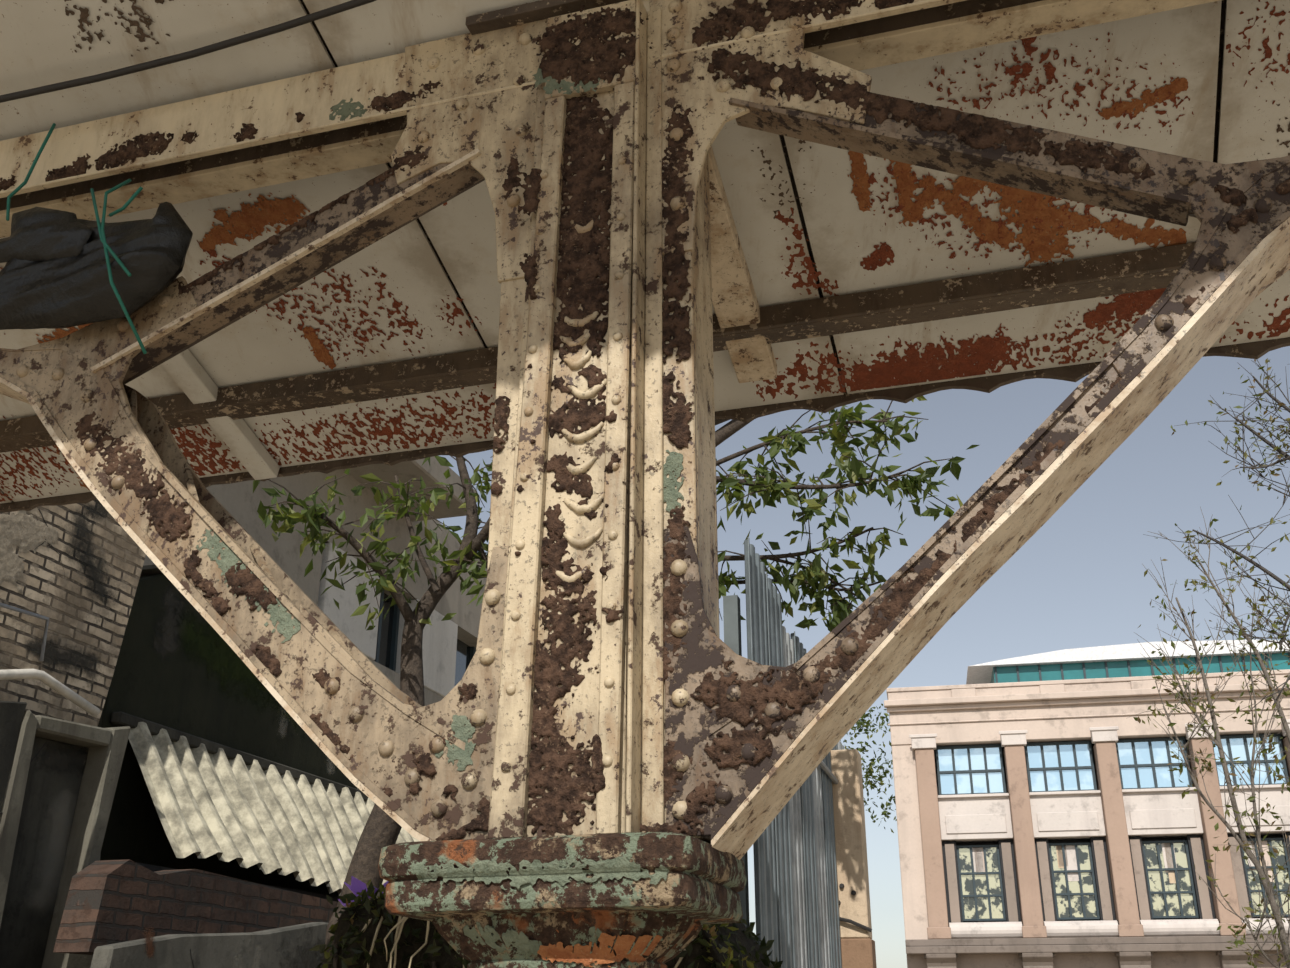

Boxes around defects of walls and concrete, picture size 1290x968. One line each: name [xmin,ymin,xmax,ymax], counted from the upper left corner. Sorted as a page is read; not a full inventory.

corrosion [692,0,1156,181]
peeling [919,32,1194,137]
peeling [1226,0,1290,107]
corrosion [173,145,428,297]
peeling [775,207,839,300]
peeling [753,288,1166,401]
peeling [848,151,1187,276]
corrosion [1085,377,1122,413]
corrosion [1181,284,1211,316]
peeling [1219,280,1290,343]
peeling [170,425,246,476]
peeling [537,926,662,968]